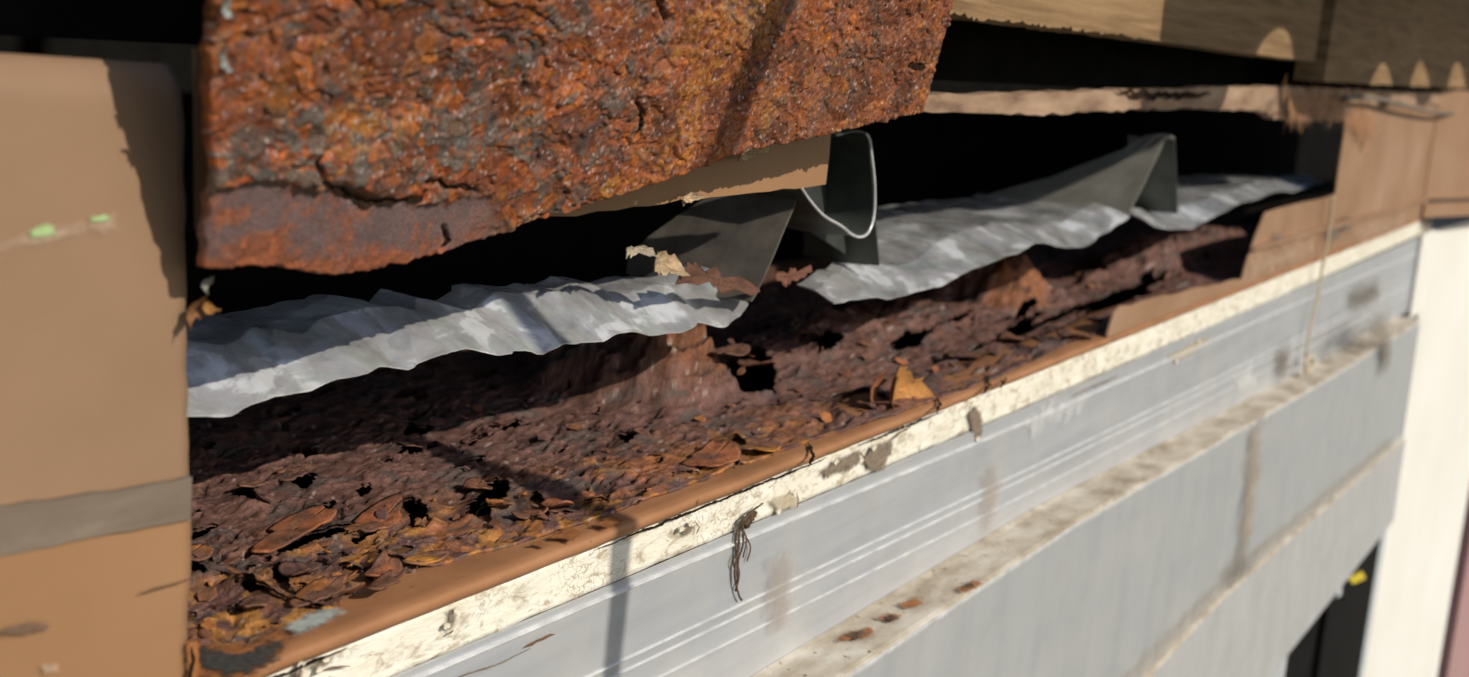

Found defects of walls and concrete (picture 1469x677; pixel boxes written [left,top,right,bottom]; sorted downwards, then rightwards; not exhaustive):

rust [626,245,760,296]
rust [774,265,812,287]
rust [711,343,777,367]
spalling [737,374,786,406]
rust [855,365,935,409]
peeling [968,400,983,442]
peeling [823,426,911,478]
rust [462,477,513,507]
spalling [402,499,421,528]
peeling [679,520,700,535]
rust [239,493,449,609]
peeling [444,606,460,635]